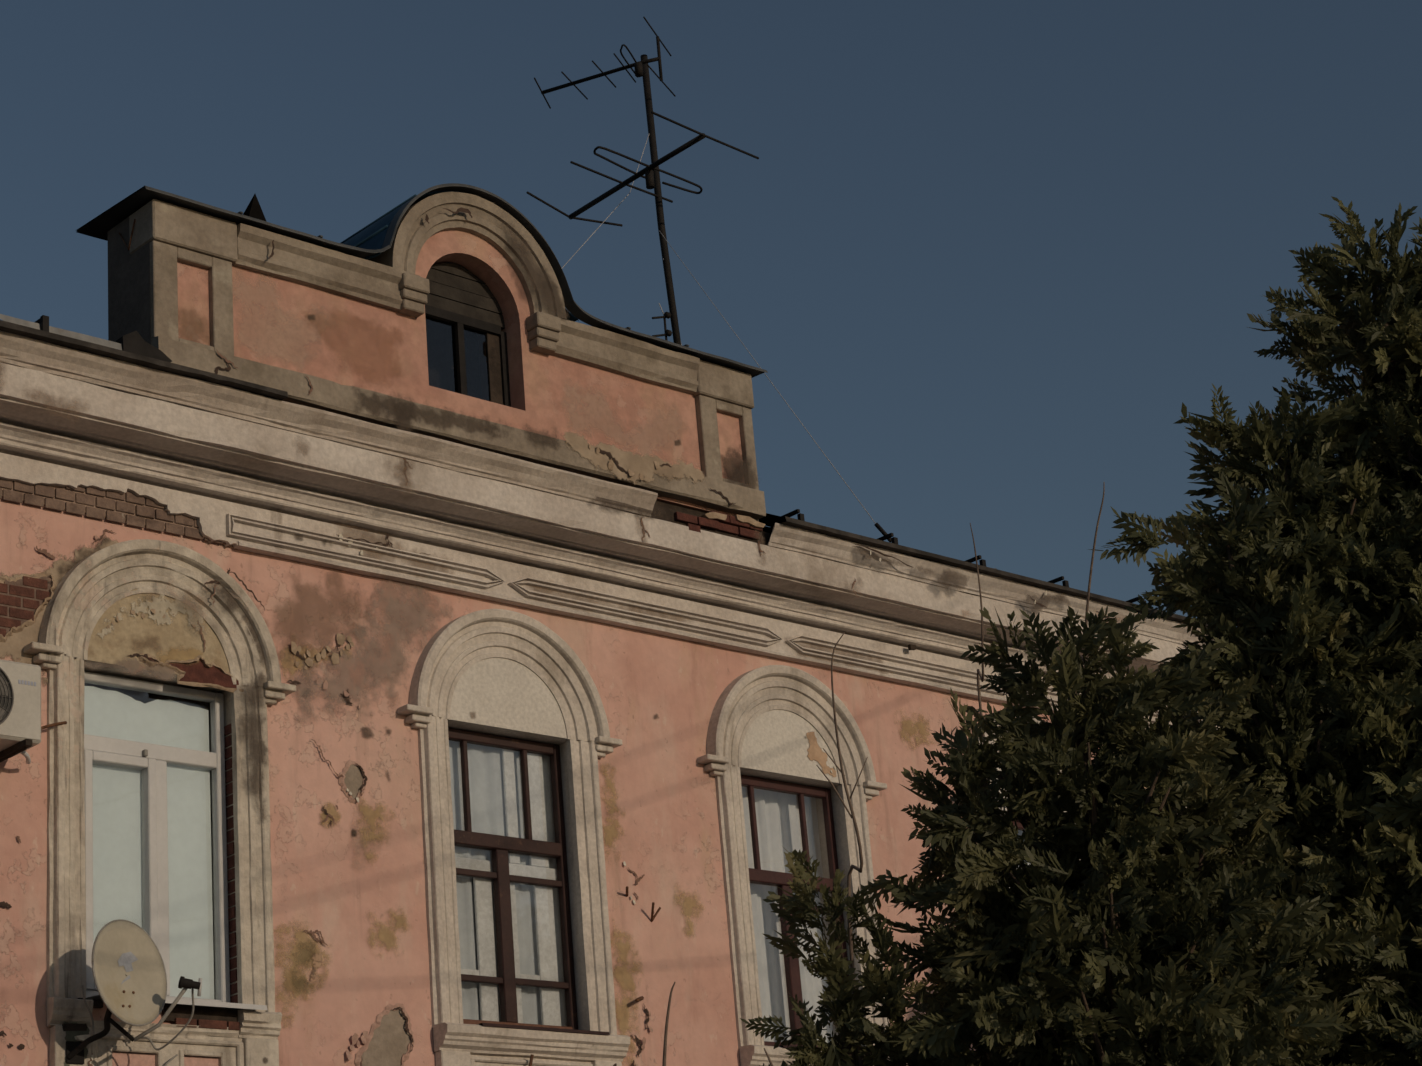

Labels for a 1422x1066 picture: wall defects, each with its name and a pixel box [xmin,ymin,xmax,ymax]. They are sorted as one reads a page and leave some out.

spalling [563,431,704,484]
flaking render [592,497,773,547]
flaking render [0,479,244,693]
spalling [312,739,368,804]
spalling [346,1003,415,1066]